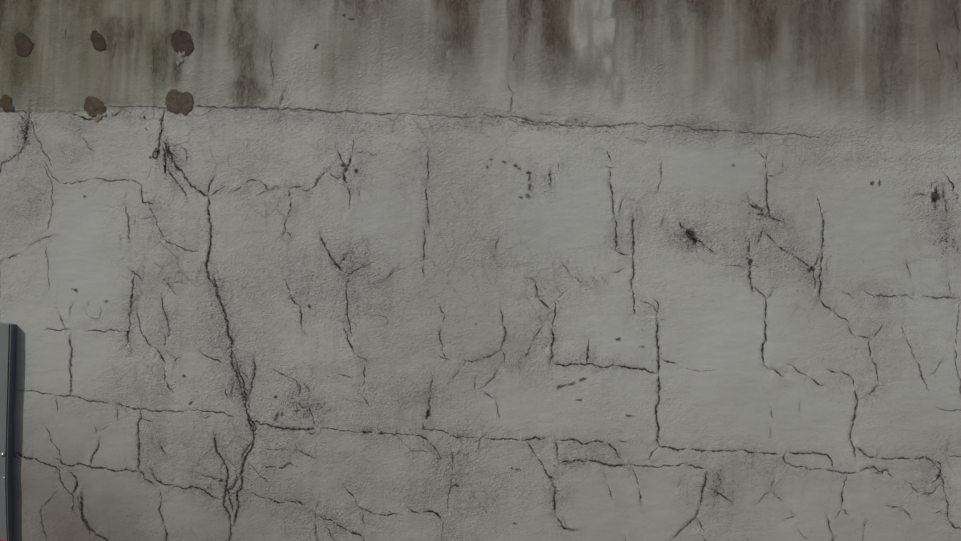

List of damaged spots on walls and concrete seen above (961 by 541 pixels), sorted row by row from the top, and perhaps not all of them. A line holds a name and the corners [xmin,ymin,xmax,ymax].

crack [0,105,547,541]
damp [569,0,622,99]
crack [657,125,815,138]
crack [526,153,961,539]